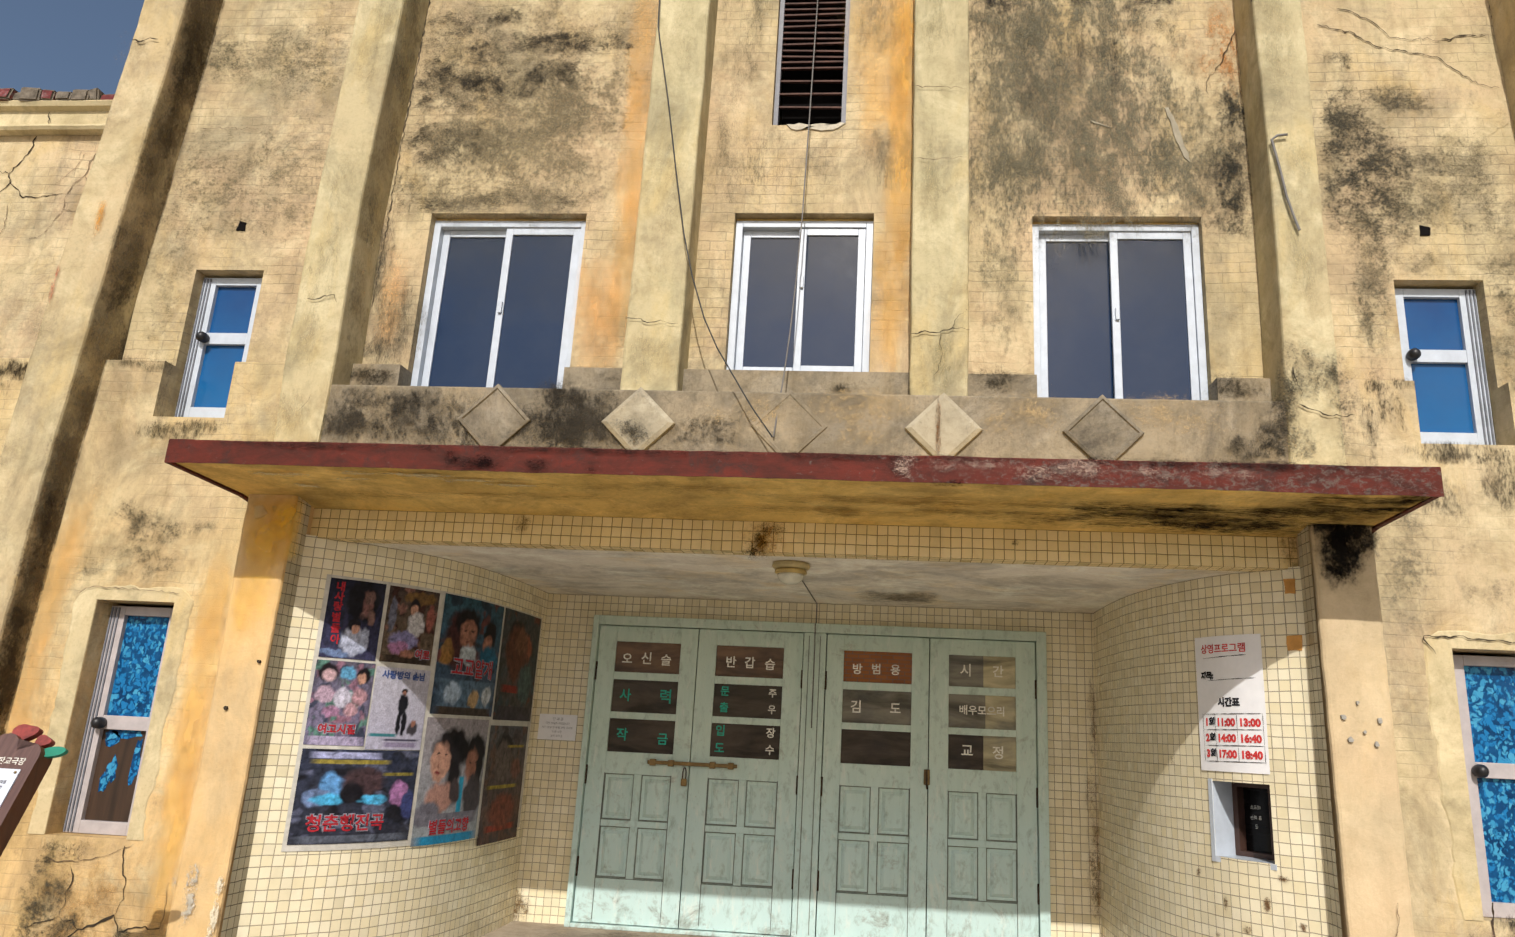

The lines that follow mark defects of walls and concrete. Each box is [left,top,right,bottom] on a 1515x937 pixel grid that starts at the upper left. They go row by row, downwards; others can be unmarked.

crack [1317,5,1499,88]
damp [387,0,632,209]
damp [969,0,1252,240]
crack [0,112,96,238]
damp [1322,88,1479,345]
damp [1215,346,1404,470]
peeling [1023,458,1102,480]
damp [1424,442,1515,505]
damp [745,508,785,556]
damp [1012,493,1461,587]
damp [16,844,84,937]
crack [21,846,168,937]